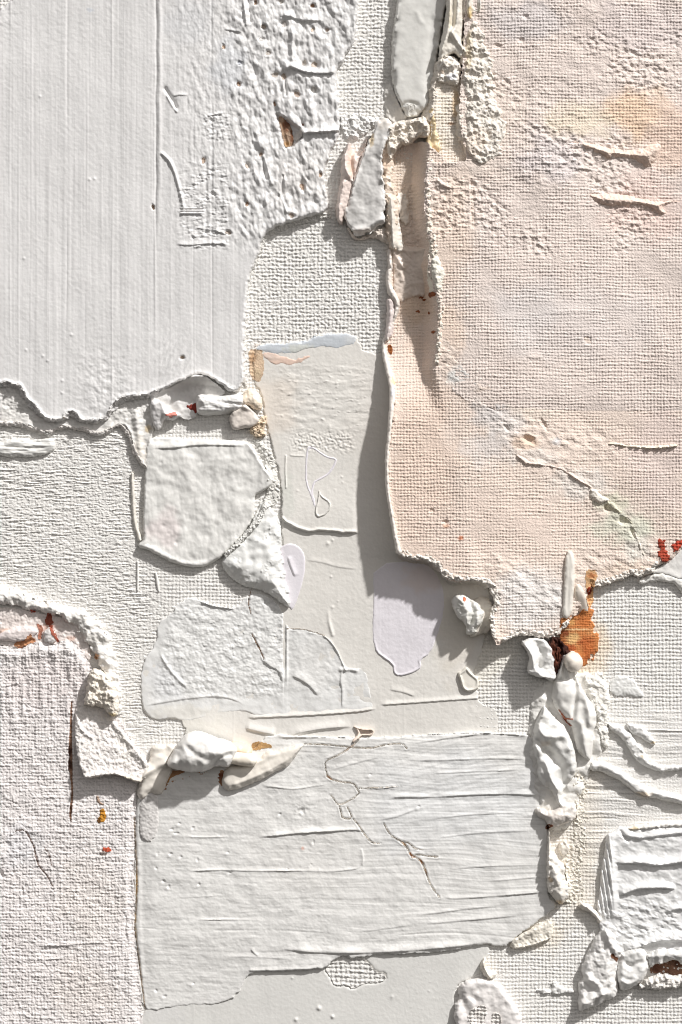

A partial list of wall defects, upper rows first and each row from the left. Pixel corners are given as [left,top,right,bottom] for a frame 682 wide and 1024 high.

peeling [397,192,410,226]
corrosion [14,609,59,648]
corrosion [559,569,599,666]
crack [304,736,440,898]